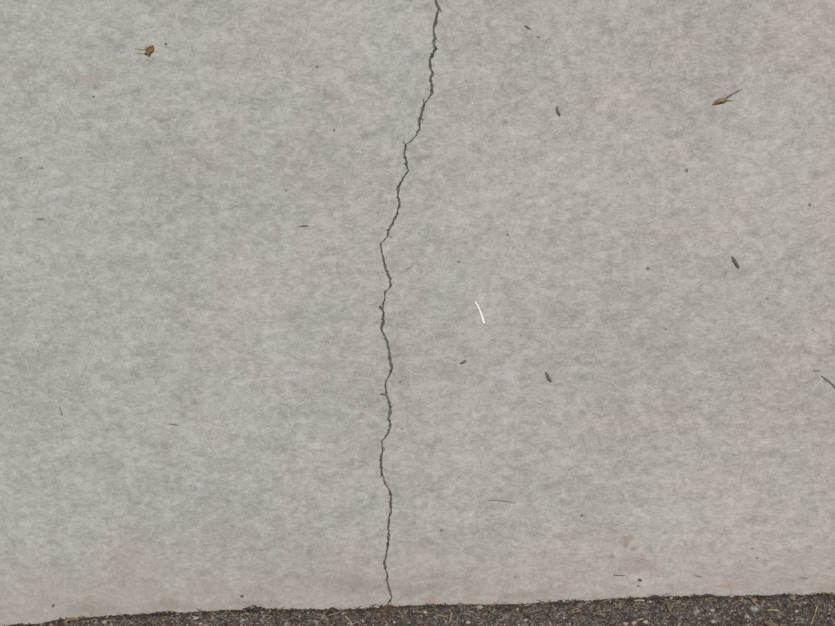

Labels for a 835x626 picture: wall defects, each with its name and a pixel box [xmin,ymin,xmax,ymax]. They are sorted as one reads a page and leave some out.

crack [379,0,442,605]